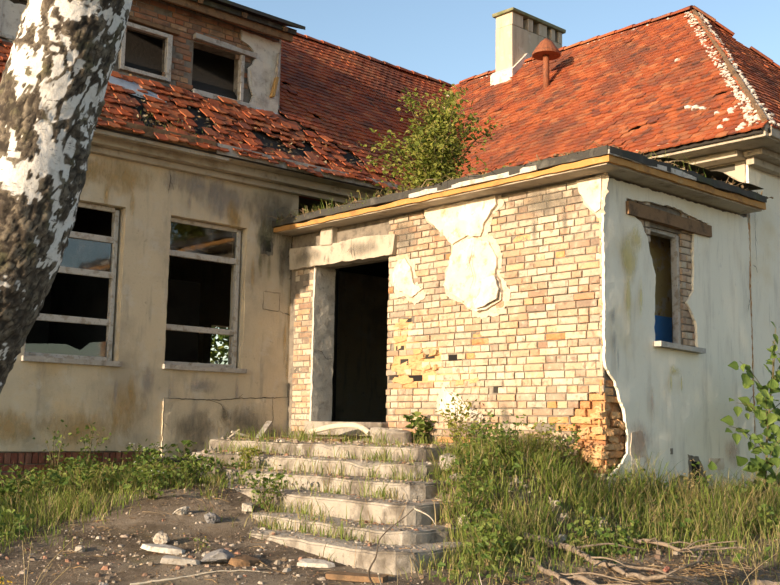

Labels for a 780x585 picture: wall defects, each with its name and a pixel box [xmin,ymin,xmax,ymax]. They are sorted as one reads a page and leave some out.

peeling [424,194,504,246]
peeling [576,173,609,218]
peeling [390,253,429,305]
spalling [389,316,489,424]
crack [162,394,289,453]
spalling [569,392,649,475]